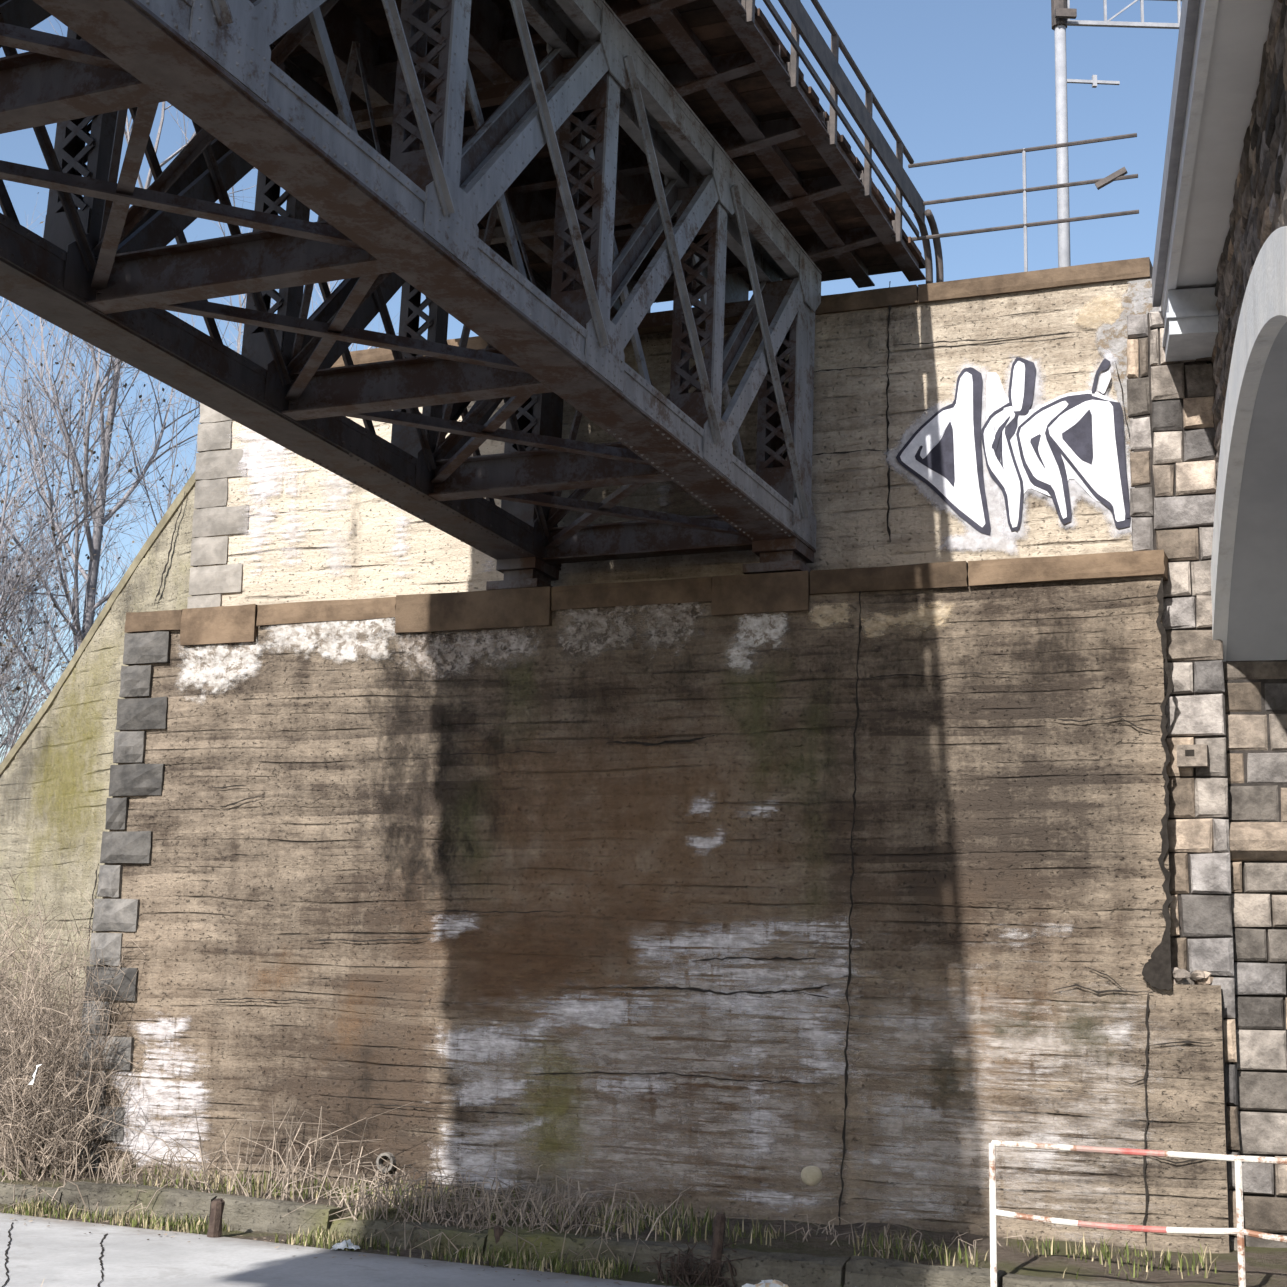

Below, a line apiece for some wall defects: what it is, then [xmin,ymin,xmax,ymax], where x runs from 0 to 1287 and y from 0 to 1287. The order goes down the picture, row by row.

crack [814,281,1081,542]
leakage [435,917,475,935]
leakage [690,832,724,848]
crack [526,591,1017,1225]
leakage [114,1020,206,1165]
leakage [433,922,855,1190]
leakage [744,1192,832,1212]